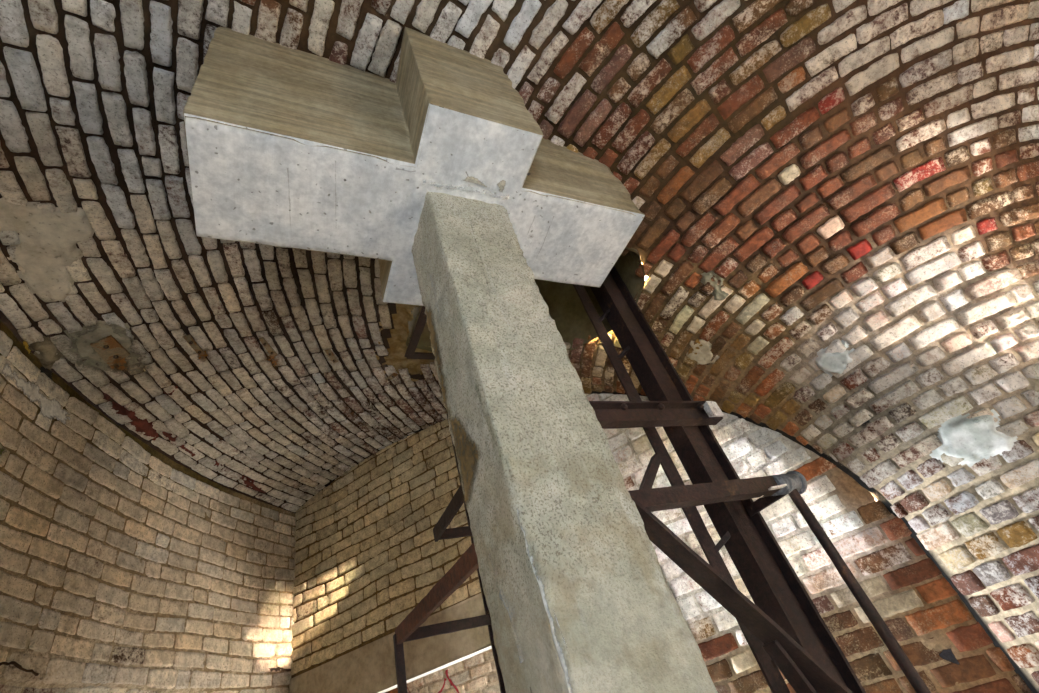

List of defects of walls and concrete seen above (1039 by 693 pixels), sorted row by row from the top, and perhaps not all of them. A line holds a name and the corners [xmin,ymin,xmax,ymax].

water stain [815,340,855,377]
peeling [103,392,199,457]
peeling [240,476,266,493]
crack [0,661,39,676]